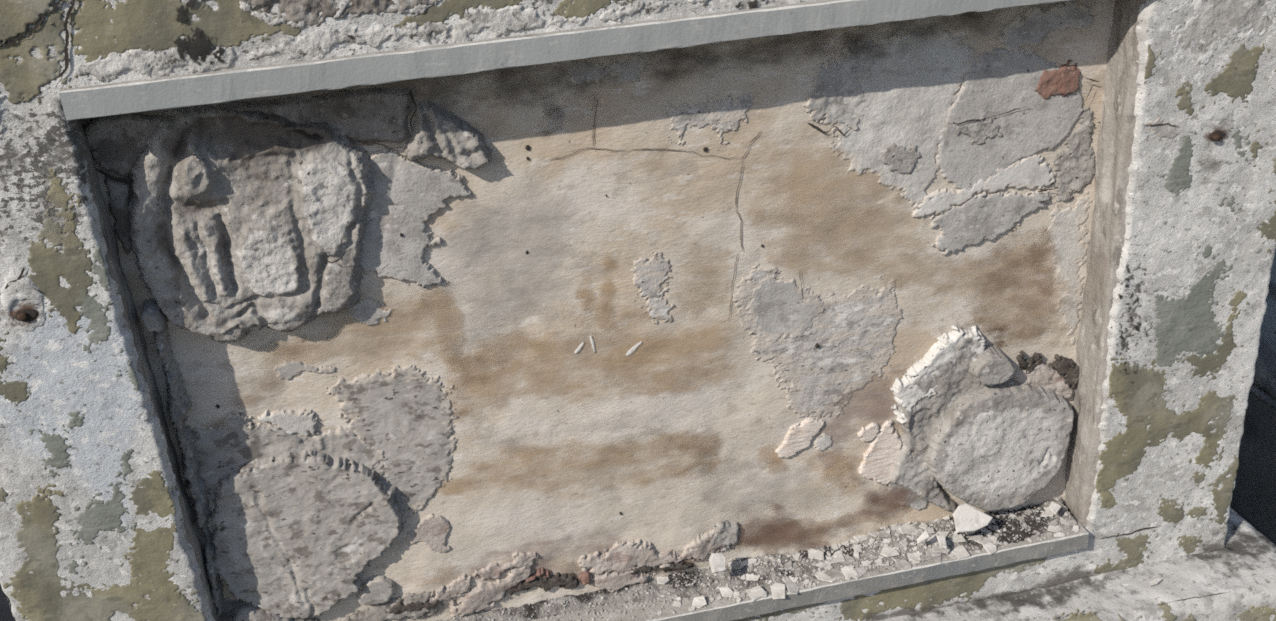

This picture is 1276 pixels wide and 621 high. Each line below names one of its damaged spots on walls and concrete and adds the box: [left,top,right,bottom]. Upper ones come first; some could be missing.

flaking render [1034,59,1081,100]
spalling [404,101,492,170]
crack [546,98,761,320]
peeling [0,168,121,413]
spalling [1012,337,1080,399]
peeling [0,298,225,621]
peeling [407,513,452,553]
flaking render [953,503,993,533]
flaking render [356,520,757,618]
peeling [732,542,1055,621]
peeling [1044,609,1102,621]
peeling [1157,601,1196,621]